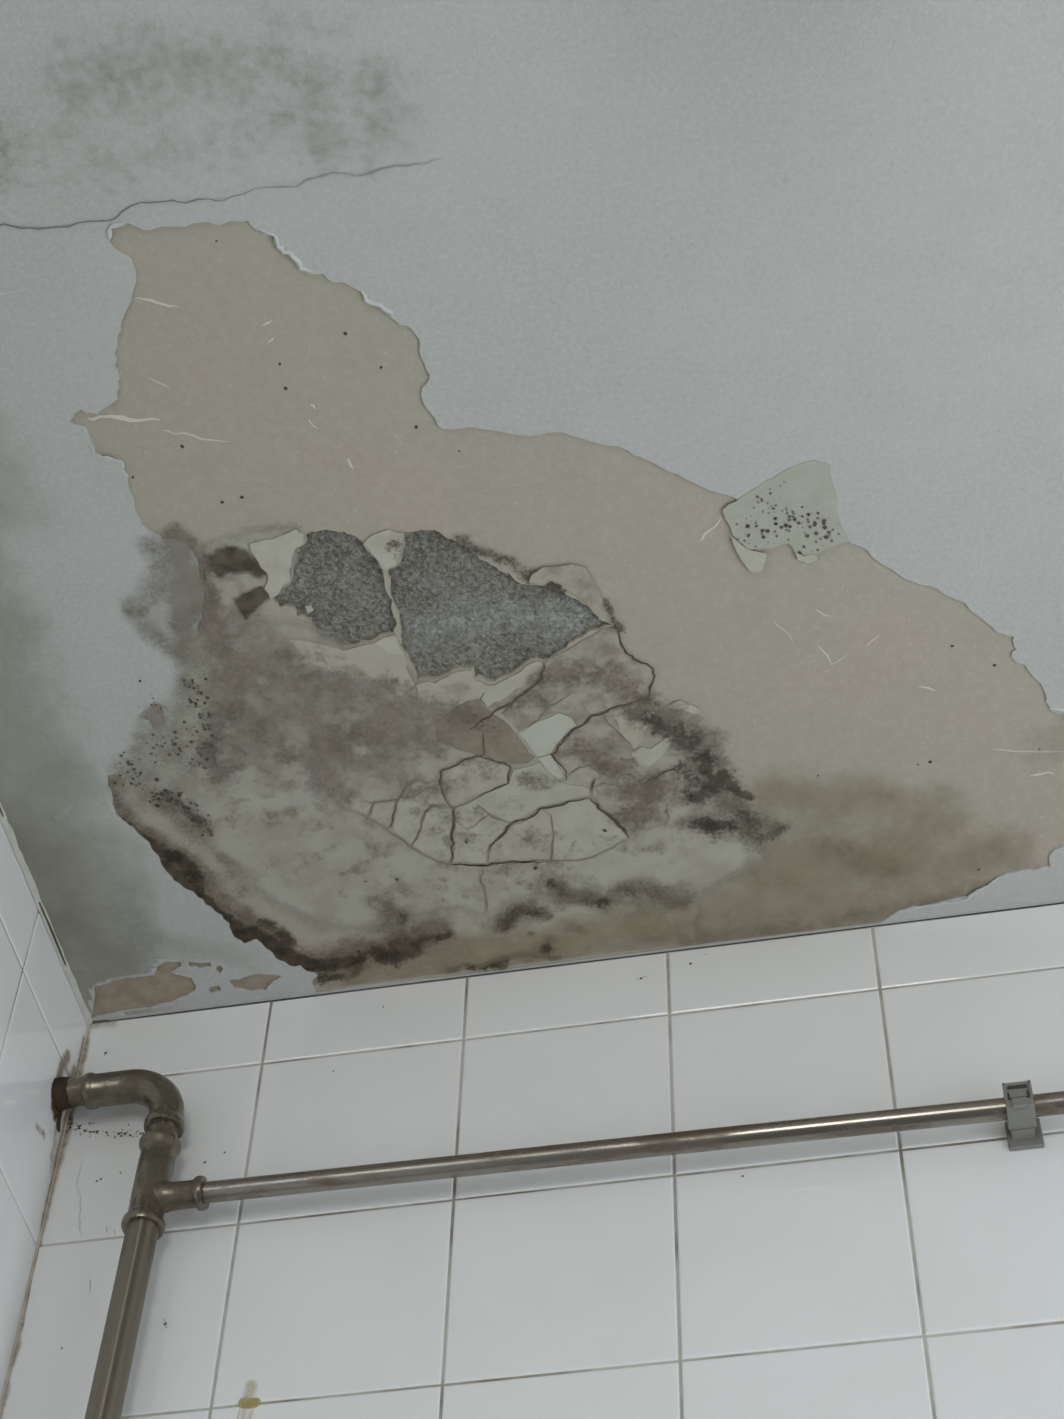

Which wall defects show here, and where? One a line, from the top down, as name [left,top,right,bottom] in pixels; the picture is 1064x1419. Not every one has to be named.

peeling [71,221,1064,993]
damp [110,526,691,985]
crack [347,629,681,913]
damp [568,663,926,911]
corrosion [37,1039,144,1216]
peeling [92,962,280,1017]